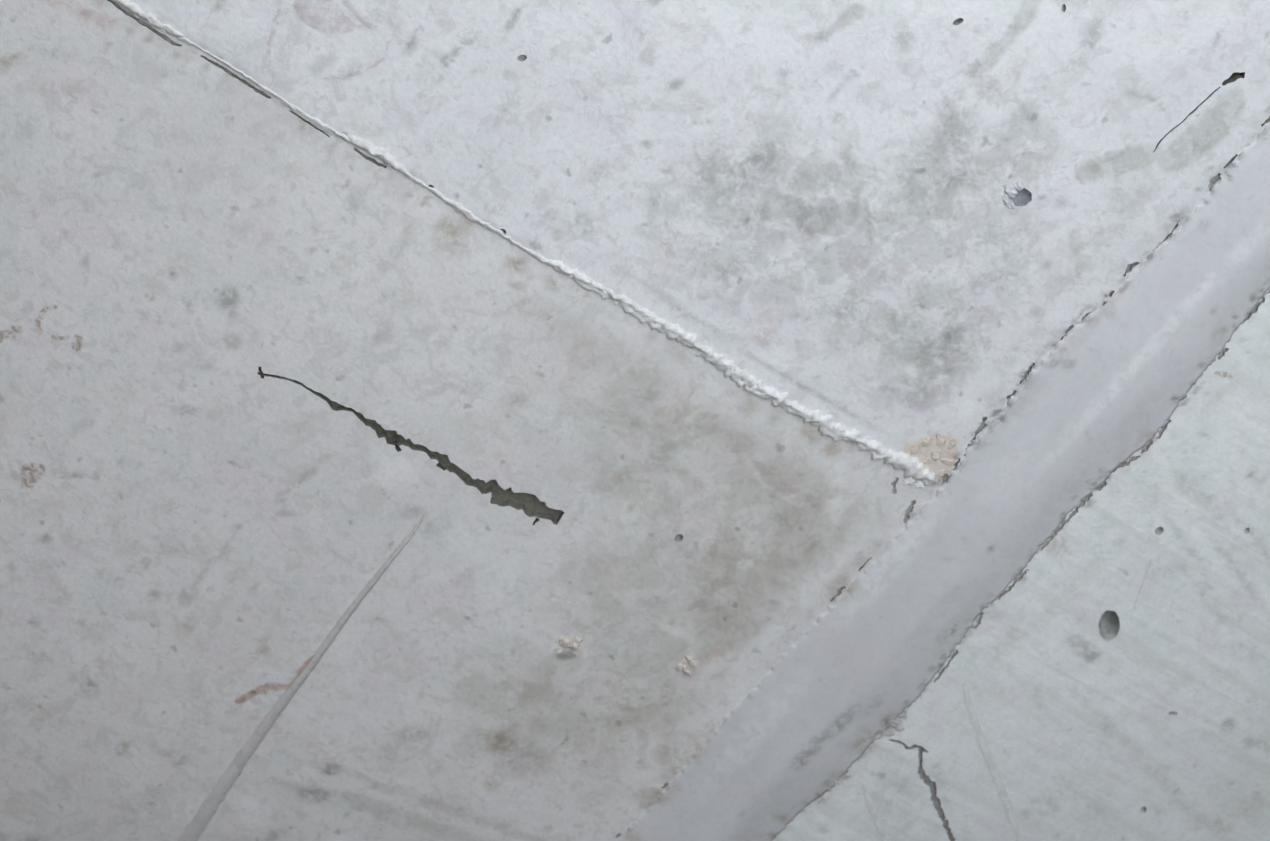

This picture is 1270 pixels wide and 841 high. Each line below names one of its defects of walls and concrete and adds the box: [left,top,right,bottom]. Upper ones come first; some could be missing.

crack [257,367,564,525]
crack [889,739,955,841]